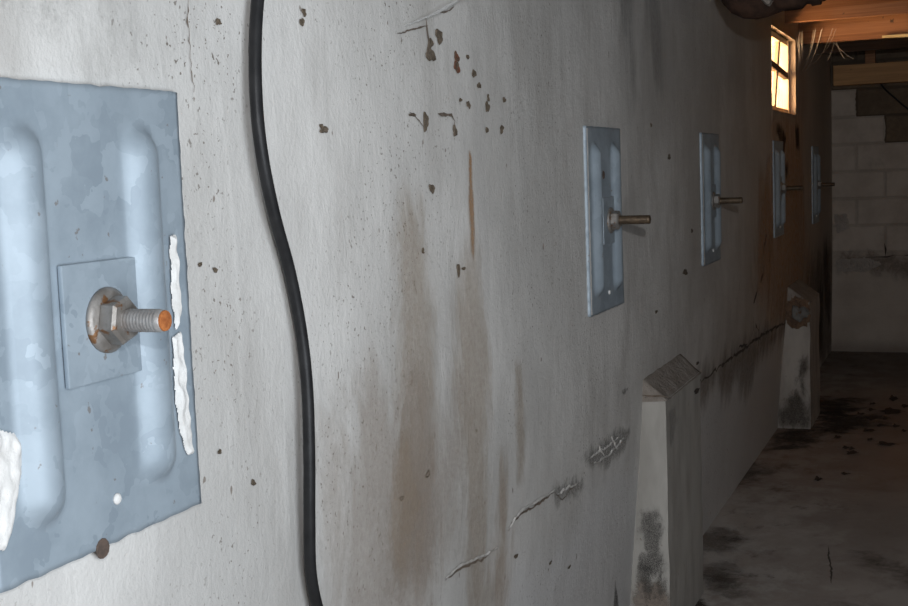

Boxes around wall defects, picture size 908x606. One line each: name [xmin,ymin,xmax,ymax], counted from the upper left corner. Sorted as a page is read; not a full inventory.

crack [700,234,785,383]
leakage [769,361,880,450]
crack [445,486,575,581]
leakage [638,512,665,595]